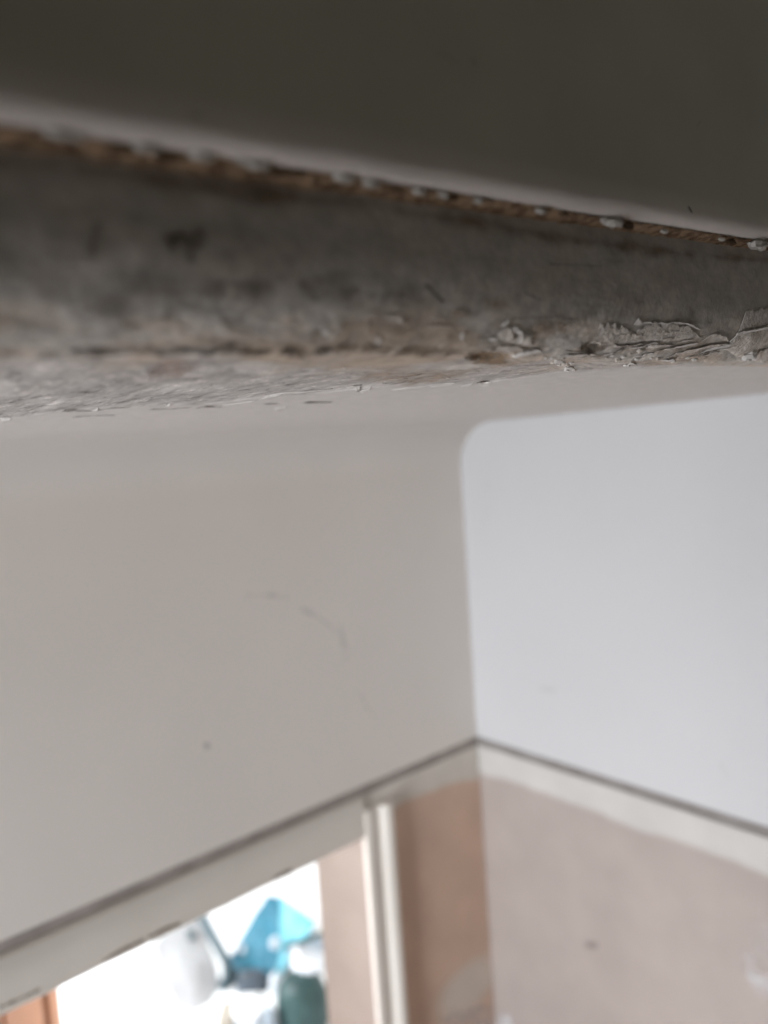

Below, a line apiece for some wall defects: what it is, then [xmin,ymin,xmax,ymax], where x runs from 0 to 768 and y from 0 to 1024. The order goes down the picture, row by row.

spalling [0,125,768,251]
damp [245,328,461,380]
peeling [471,320,542,365]
peeling [558,307,768,363]